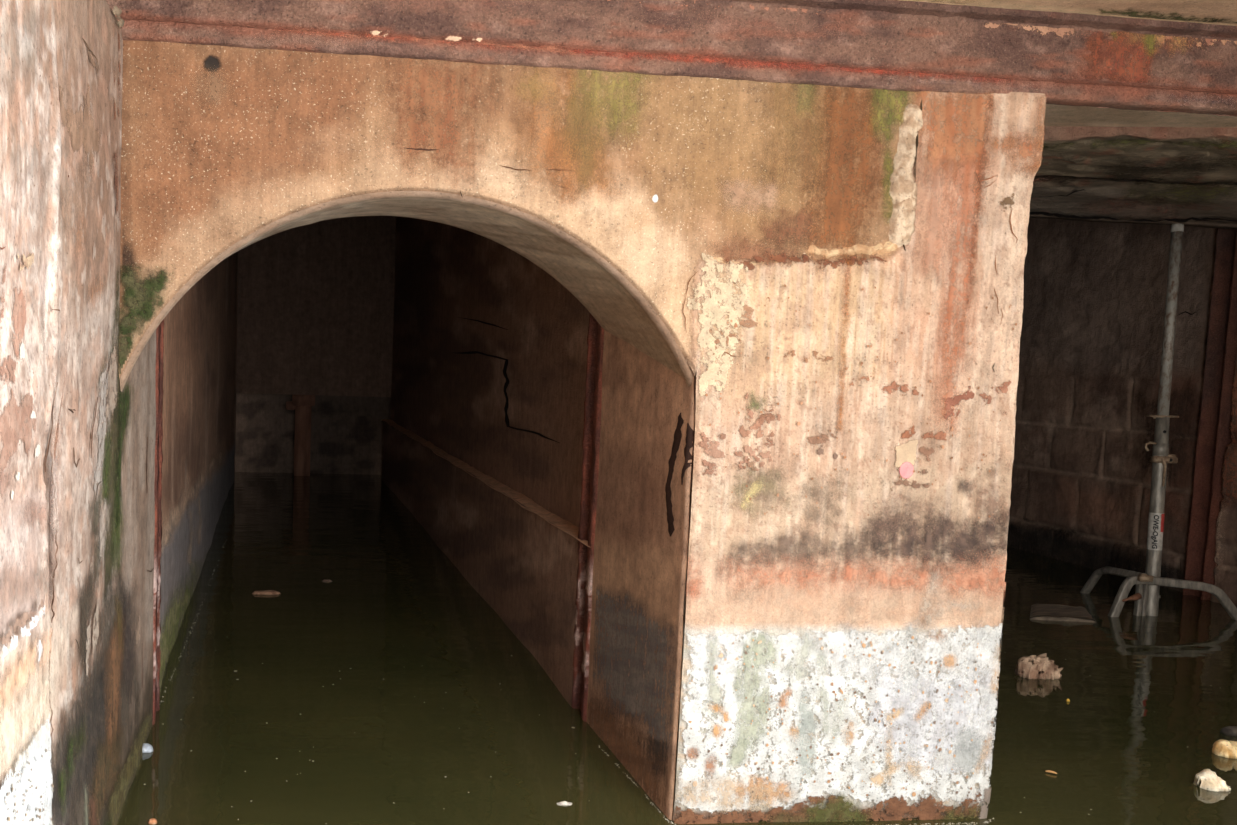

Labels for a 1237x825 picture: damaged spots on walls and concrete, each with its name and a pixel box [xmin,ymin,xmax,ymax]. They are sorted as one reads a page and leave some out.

peeling [985,22,1074,38]
flaking render [686,104,932,400]
rust [770,84,884,314]
rust [917,77,1044,428]
damp [1035,156,1237,186]
flaking render [0,252,48,495]
damp [48,406,61,603]
spalling [698,392,781,483]
spalling [866,368,1014,491]
damp [1137,391,1194,482]
damp [0,575,139,825]
damp [588,470,1146,813]